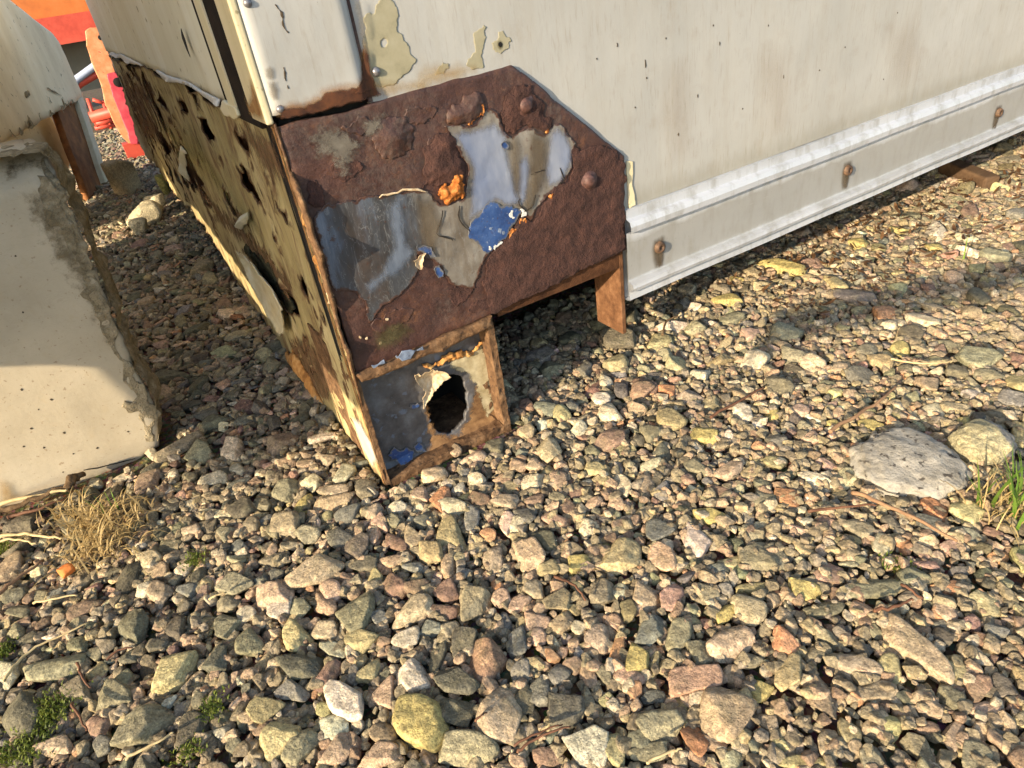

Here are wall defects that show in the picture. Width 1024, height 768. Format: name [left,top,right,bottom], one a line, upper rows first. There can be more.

rust [119,68,185,145]
peeling [362,0,417,88]
rust [422,91,485,205]
peeling [467,25,511,70]
rust [198,188,296,316]
rust [240,49,384,484]
peeling [301,108,576,323]
rust [482,145,627,314]